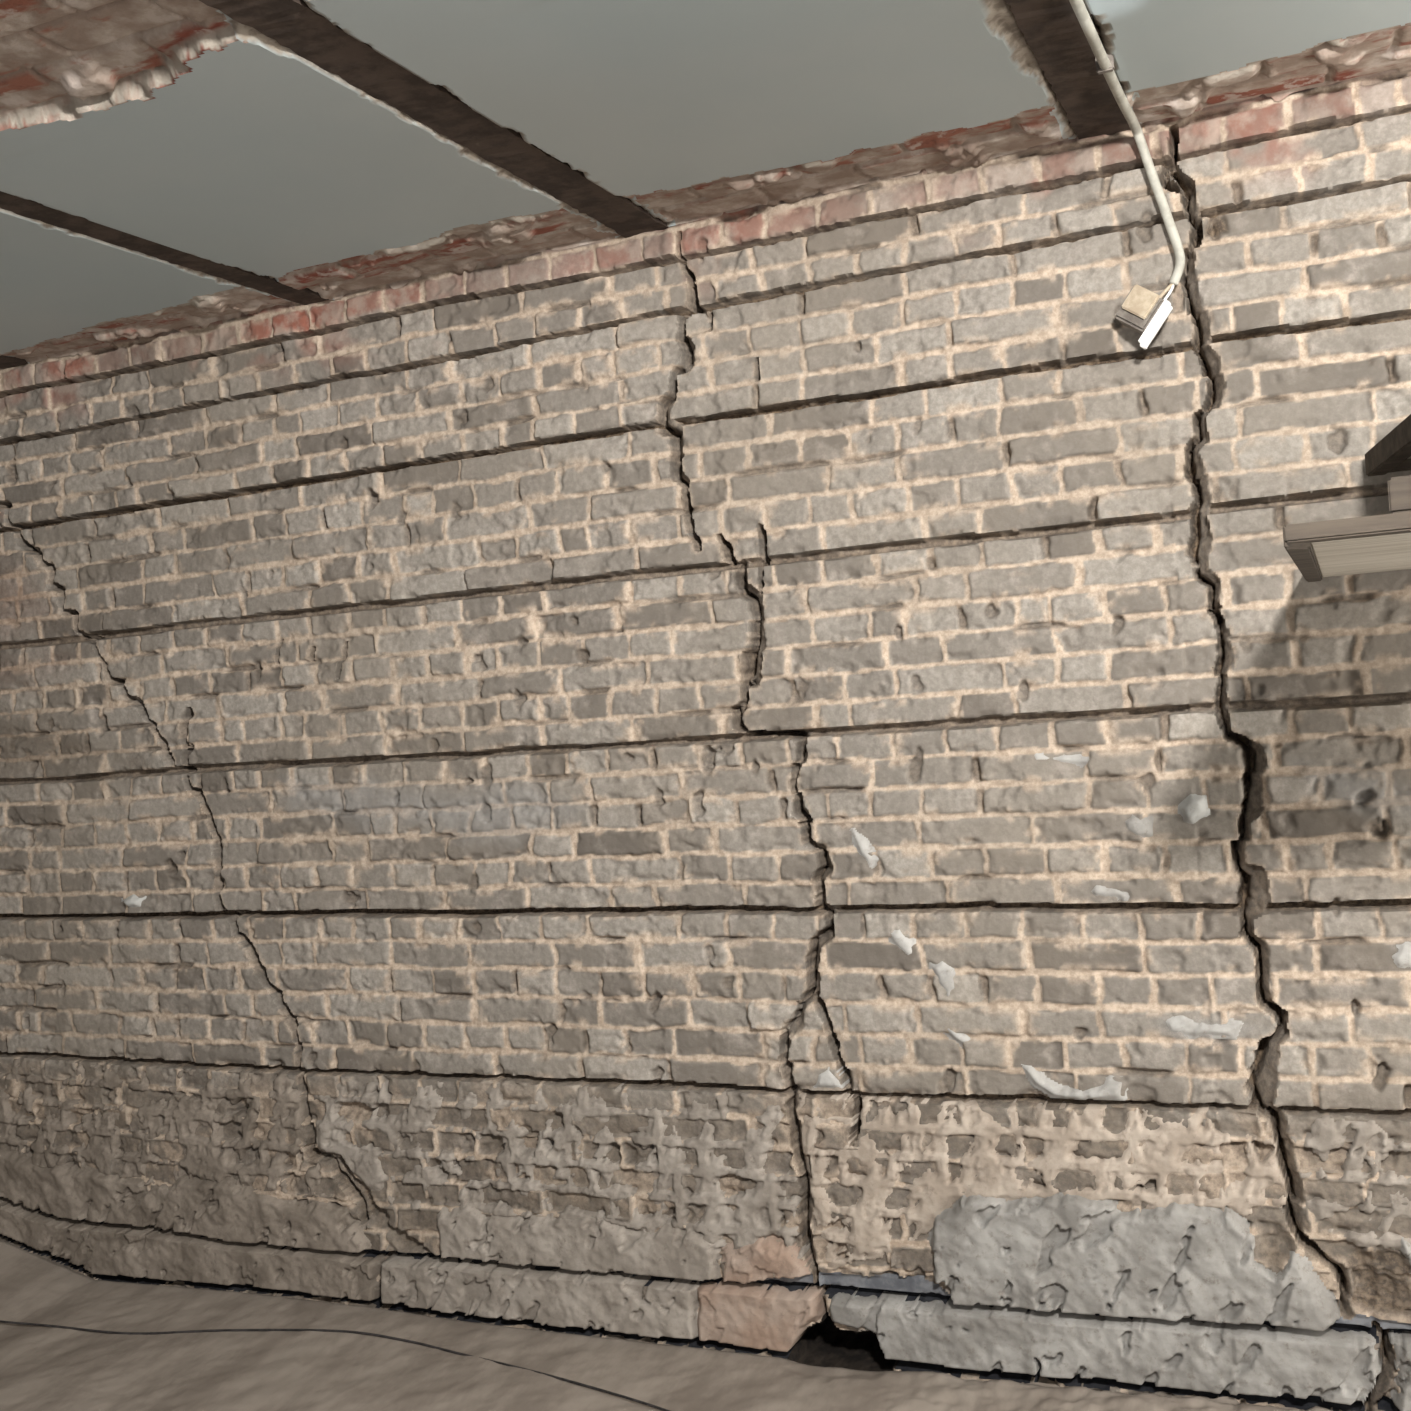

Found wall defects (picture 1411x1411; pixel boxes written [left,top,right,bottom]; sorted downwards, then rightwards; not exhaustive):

spalling [216,0,676,238]
crack [0,500,396,1310]
crack [655,231,863,1313]
crack [1157,124,1399,1411]
spalling [787,1312,899,1371]